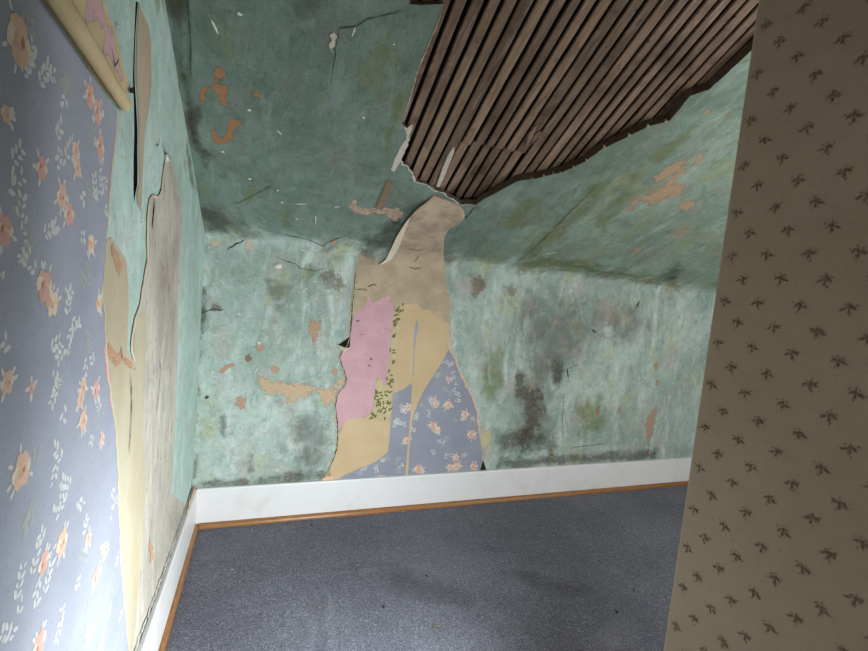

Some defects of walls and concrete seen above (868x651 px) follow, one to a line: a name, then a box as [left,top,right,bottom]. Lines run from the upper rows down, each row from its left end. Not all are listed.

peeling [199,65,246,153]
spalling [391,13,711,212]
peeling [348,199,405,222]
spalling [337,327,350,352]
flaking render [103,159,185,651]
peeling [257,366,346,405]